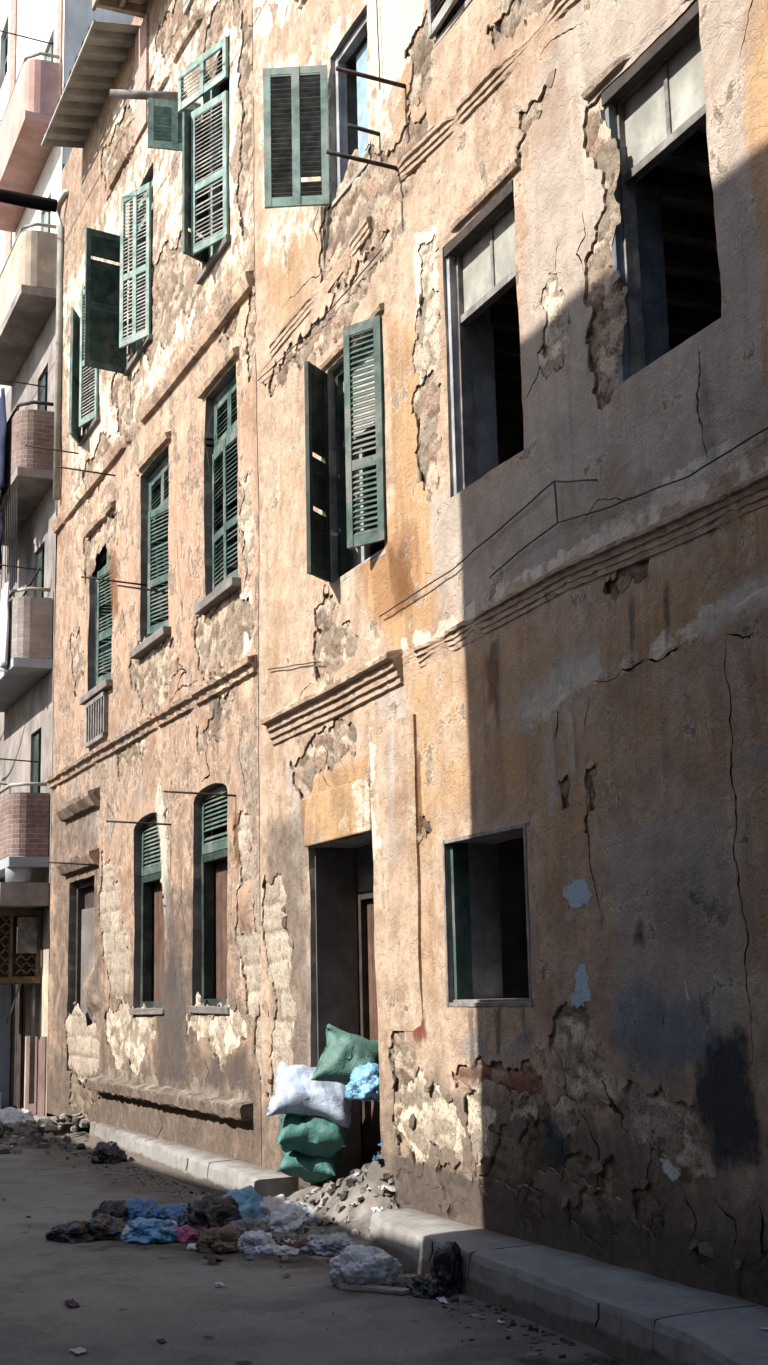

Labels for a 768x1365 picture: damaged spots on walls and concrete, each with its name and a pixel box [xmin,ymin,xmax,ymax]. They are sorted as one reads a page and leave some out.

spalling [486,0,552,48]
spalling [270,5,448,397]
spalling [584,97,628,410]
spalling [225,286,257,382]
spalling [413,236,442,495]
spalling [538,273,570,379]
spalling [313,584,359,686]
spalling [292,718,357,800]
peeling [562,877,593,909]
spalling [390,954,716,1223]
water stain [694,1028,760,1169]